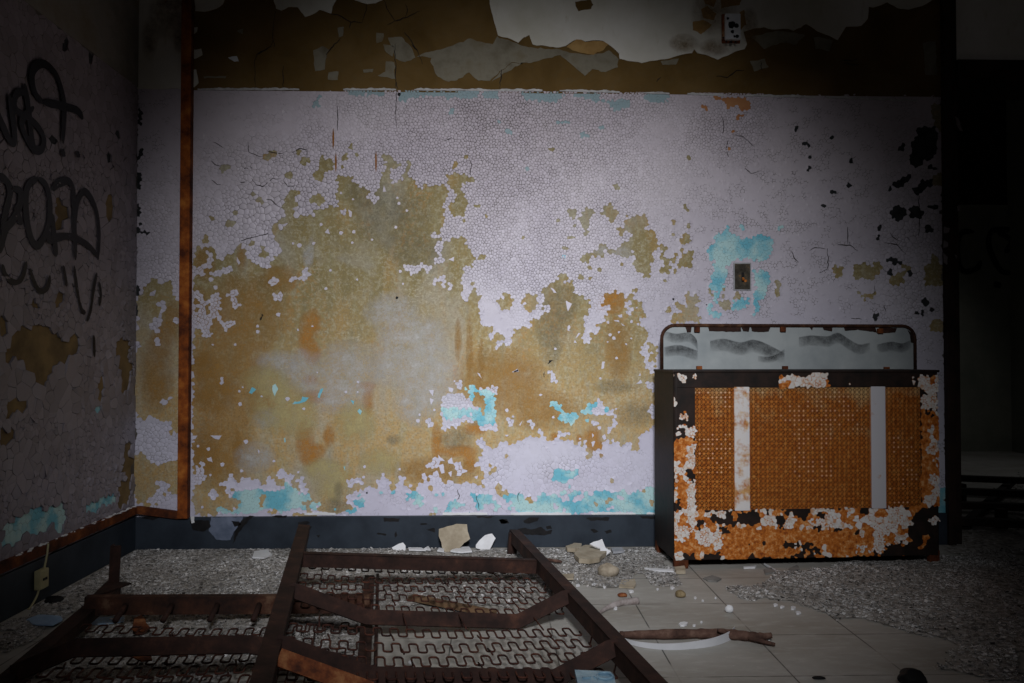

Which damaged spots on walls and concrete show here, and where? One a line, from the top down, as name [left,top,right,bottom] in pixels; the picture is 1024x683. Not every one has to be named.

crack [327,0,422,127]
spalling [194,0,941,153]
peeling [45,185,72,247]
peeling [828,121,943,336]
peeling [0,285,87,400]
peeling [190,140,787,541]
peeling [674,397,914,561]
peeling [778,372,828,389]
peeling [912,374,945,525]